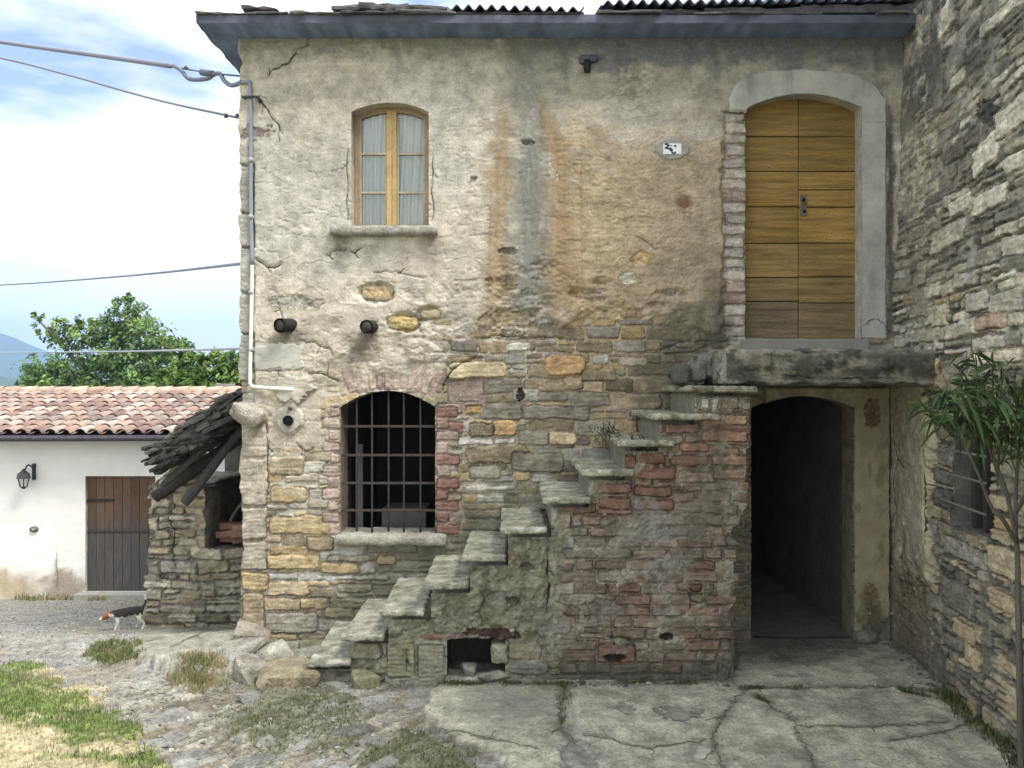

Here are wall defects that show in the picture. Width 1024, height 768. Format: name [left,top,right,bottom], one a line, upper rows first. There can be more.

crack [258,39,310,141]
water stain [503,0,959,328]
crack [329,245,423,278]
peeling [863,393,884,428]
crack [438,681,970,768]